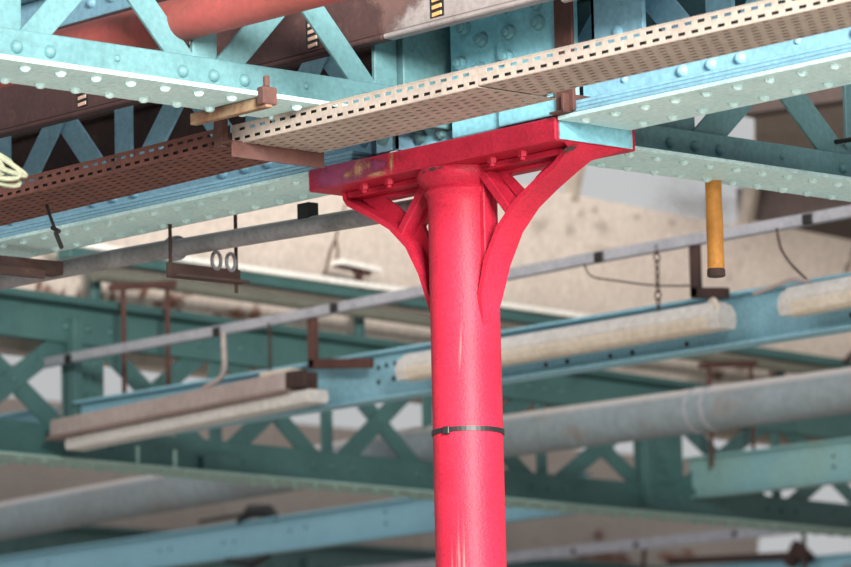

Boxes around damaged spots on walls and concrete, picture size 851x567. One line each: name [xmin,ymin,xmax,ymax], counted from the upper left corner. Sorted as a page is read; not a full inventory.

peeling [308,155,393,189]
rust [214,307,261,319]